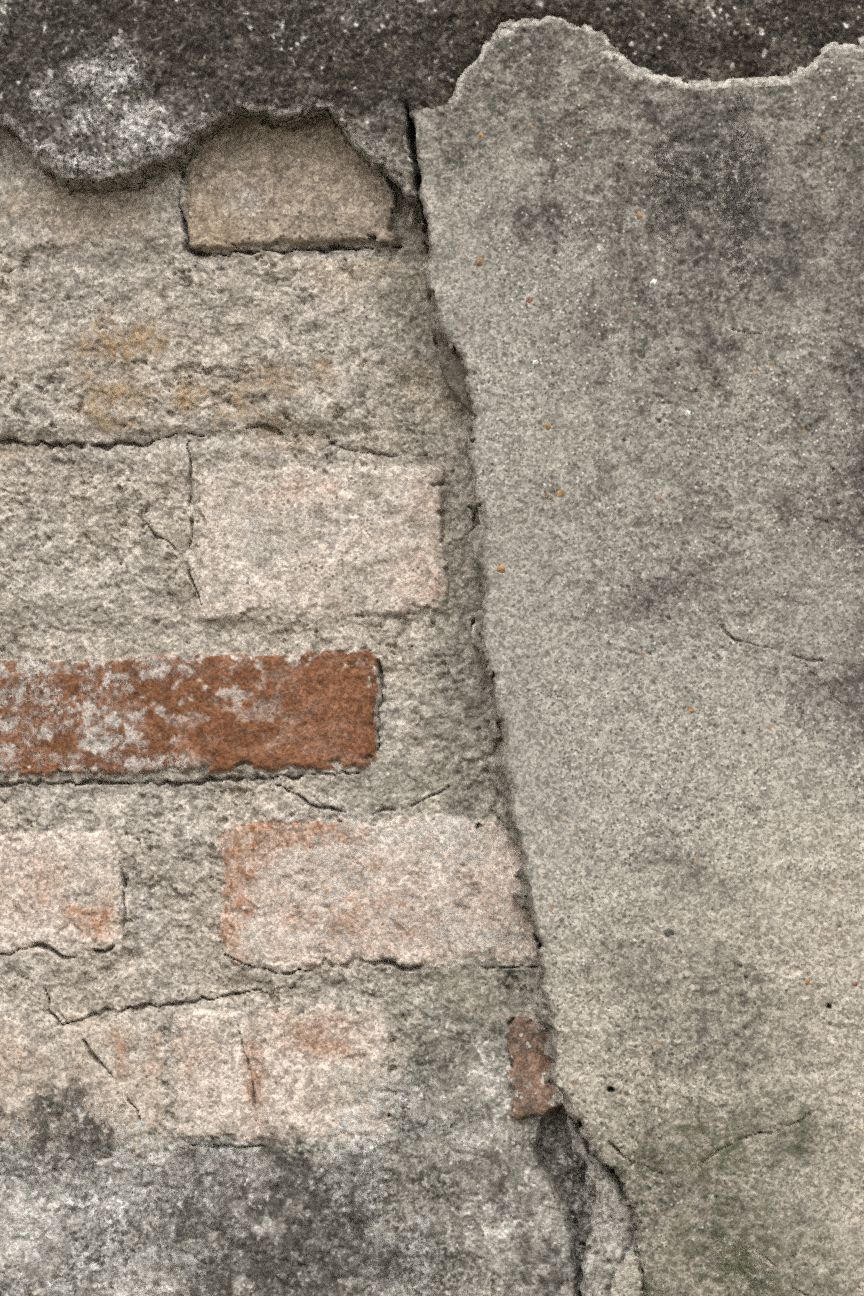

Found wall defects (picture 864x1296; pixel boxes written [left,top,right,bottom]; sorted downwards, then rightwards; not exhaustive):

flaking render [0,99,647,1296]